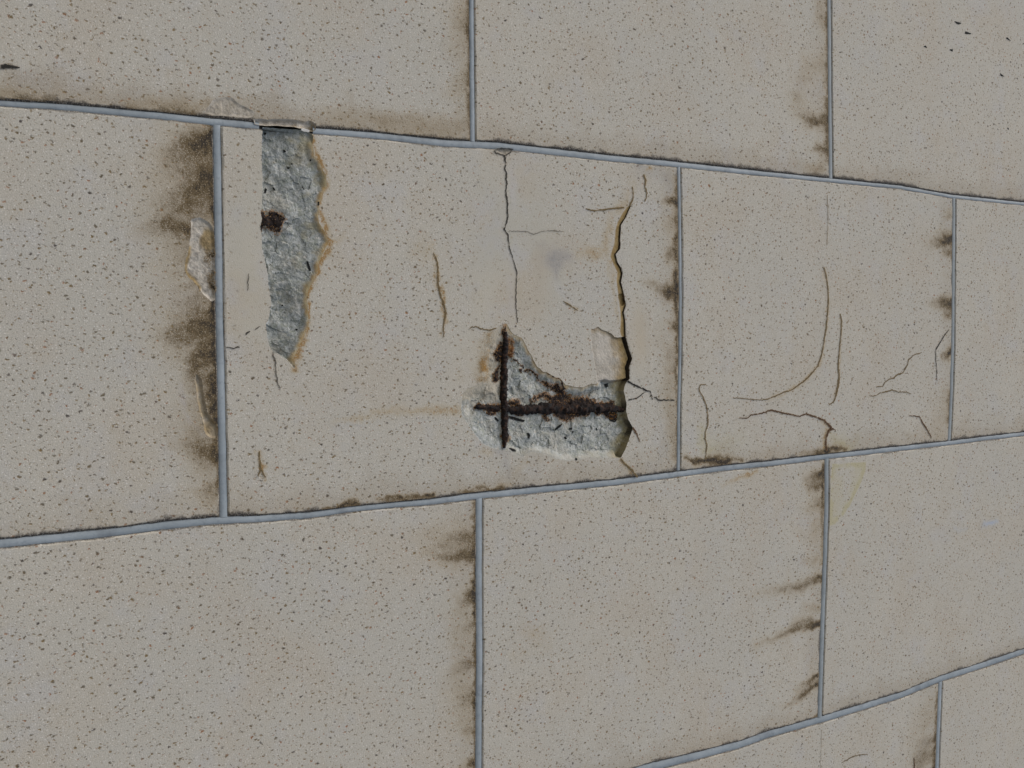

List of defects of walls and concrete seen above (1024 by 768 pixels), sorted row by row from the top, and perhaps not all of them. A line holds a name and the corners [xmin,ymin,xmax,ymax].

leakage [112,86,219,517]
spalling [185,218,217,301]
spalling [203,97,349,378]
crack [402,147,518,341]
spalling [461,323,633,461]
crack [582,174,648,337]
crack [617,427,642,478]
crack [699,384,709,459]
crack [734,264,844,454]
crack [871,329,949,438]
leakage [749,460,867,654]
leakage [774,669,819,719]